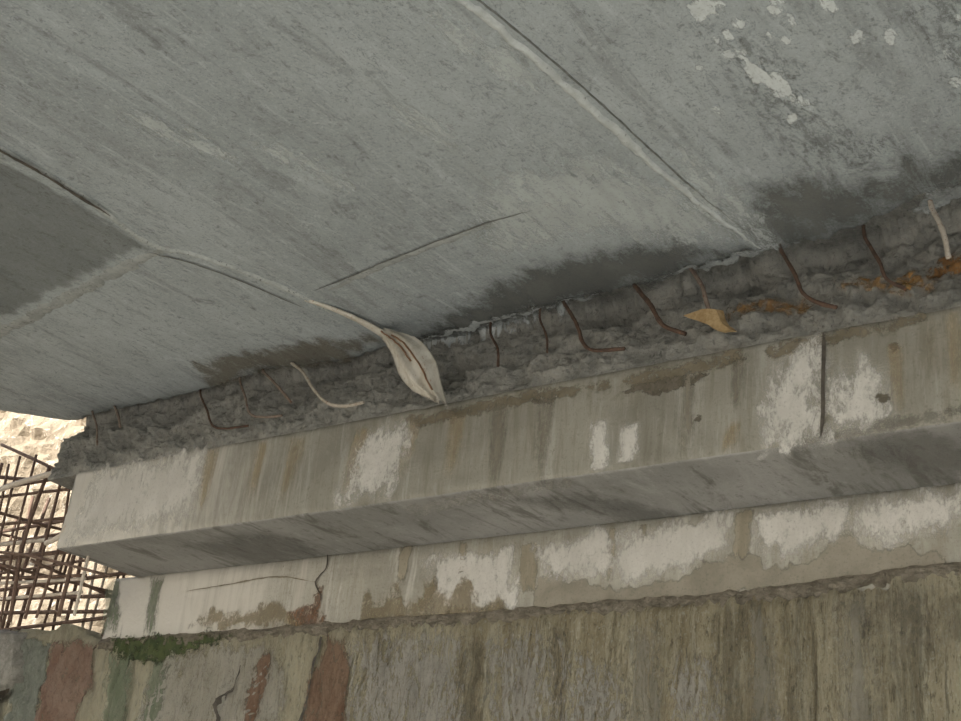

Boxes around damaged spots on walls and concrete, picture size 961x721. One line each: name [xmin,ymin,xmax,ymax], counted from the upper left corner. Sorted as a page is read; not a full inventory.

peeling [687,0,726,22]
peeling [713,17,810,124]
peeling [766,0,797,45]
peeling [819,0,839,13]
damp [418,149,961,341]
rust [840,252,961,293]
spalling [48,181,961,490]
damp [589,420,639,470]
damp [757,337,893,454]
damp [361,485,961,620]
damp [103,641,287,721]
crack [189,555,328,721]